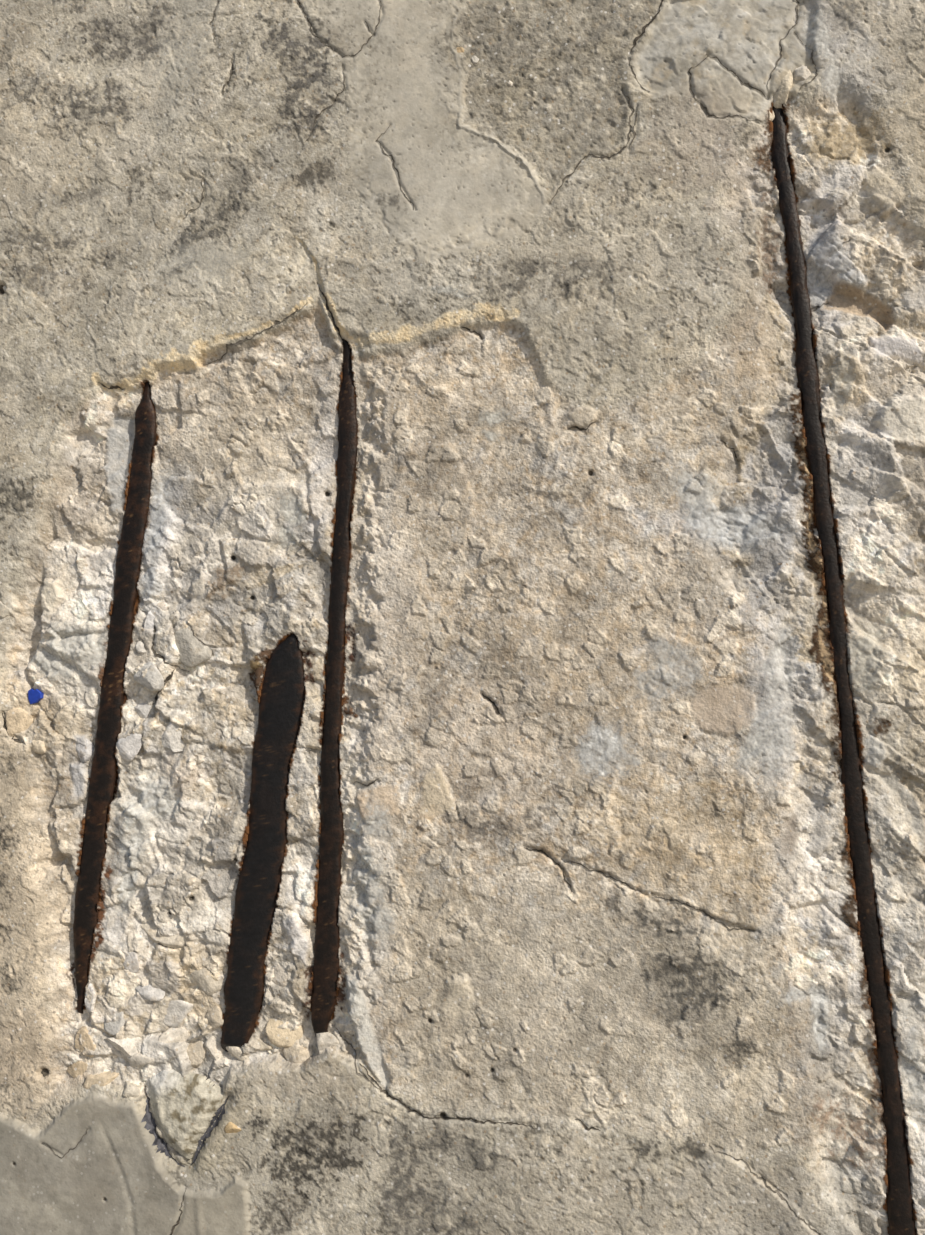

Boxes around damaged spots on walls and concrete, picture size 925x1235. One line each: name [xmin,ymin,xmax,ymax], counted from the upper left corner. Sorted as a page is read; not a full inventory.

crack [550,0,663,204]
crack [688,0,818,121]
crack [207,287,342,365]
corrosion [67,857,113,1010]
spalling [0,291,343,1170]
corrosion [241,617,329,1046]
crack [332,1025,538,1129]
spalling [295,114,889,1235]
crack [524,847,758,931]
corrosion [753,98,892,1235]
spalling [783,66,925,1235]
corrosion [873,885,914,1186]